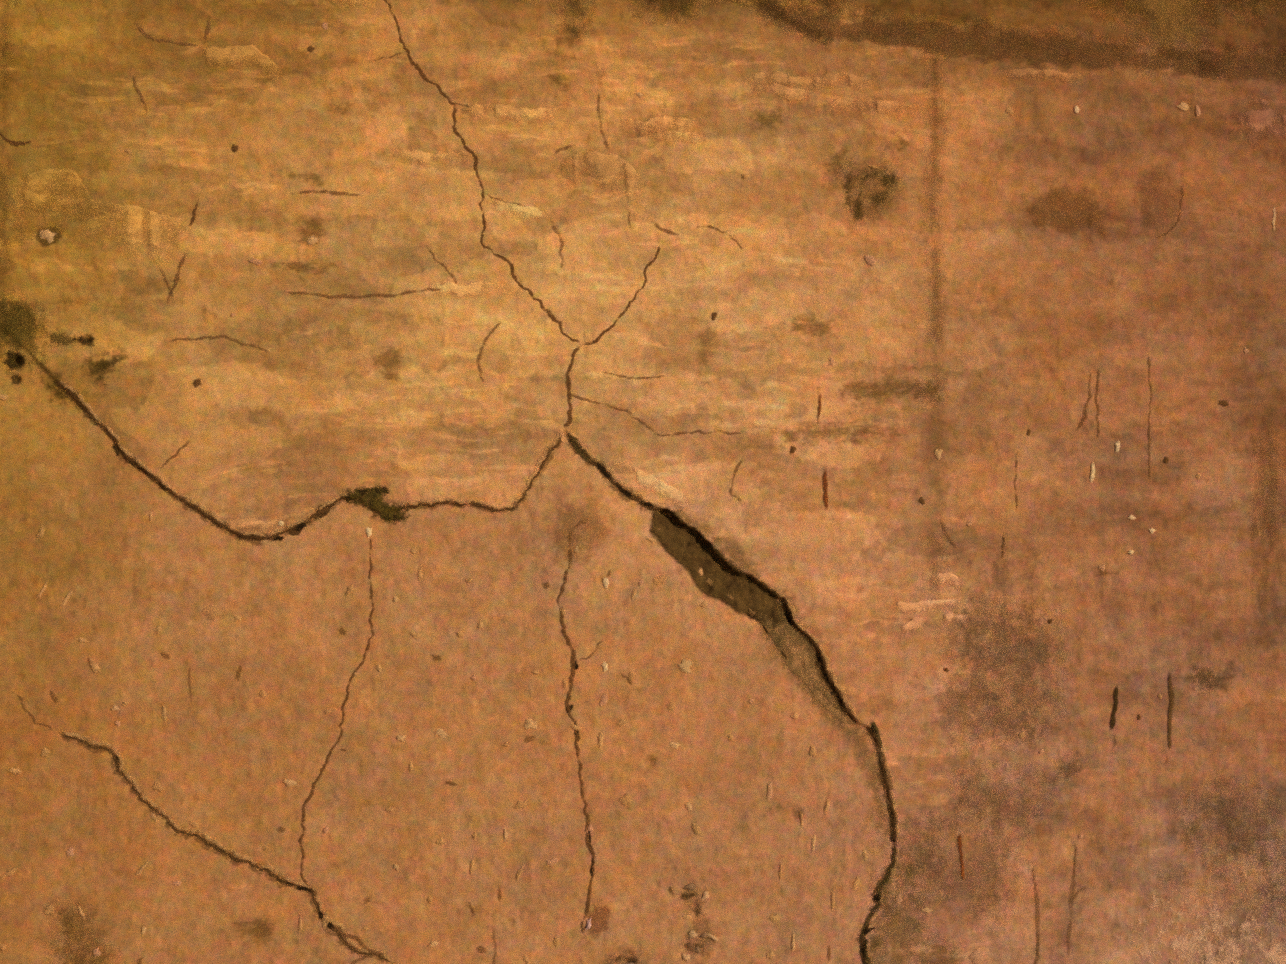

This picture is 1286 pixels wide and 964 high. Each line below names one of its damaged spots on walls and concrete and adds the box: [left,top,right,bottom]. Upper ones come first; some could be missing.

crack [139,17,211,45]
crack [0,132,31,146]
crack [190,202,198,225]
crack [301,189,359,197]
crack [161,257,185,303]
crack [289,250,457,298]
crack [379,0,743,512]
crack [172,334,268,352]
crack [56,380,349,540]
crack [557,520,602,932]
crack [19,539,395,964]
crack [783,600,899,964]